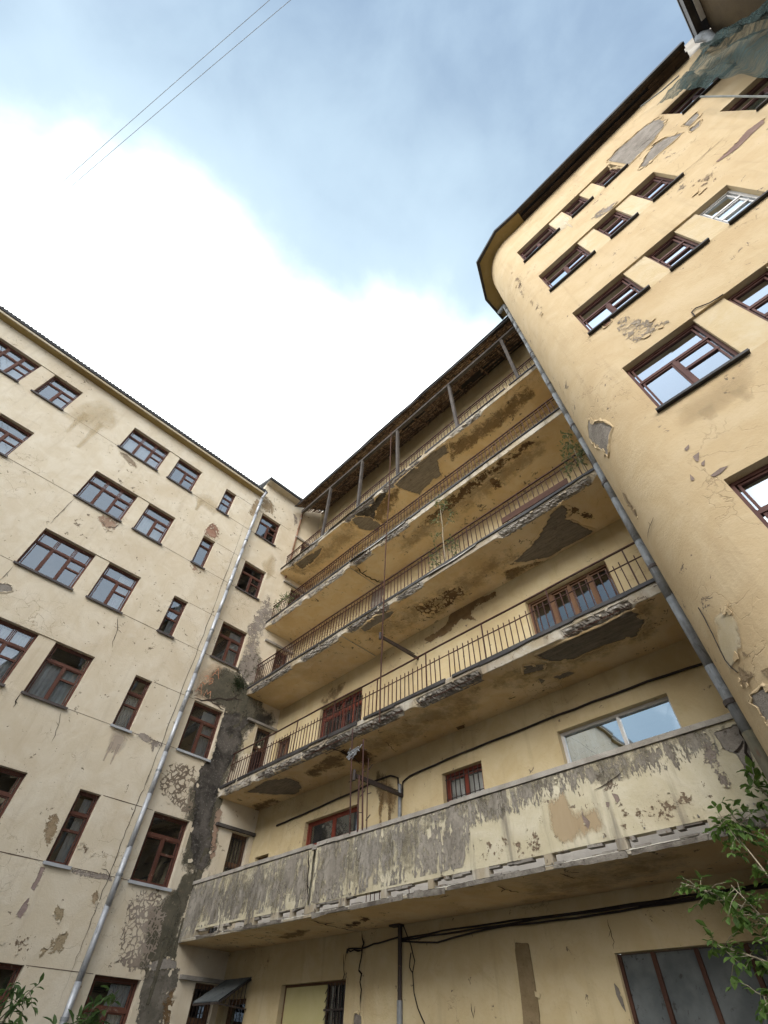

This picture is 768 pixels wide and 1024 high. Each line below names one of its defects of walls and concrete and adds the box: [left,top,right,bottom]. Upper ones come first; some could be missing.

flaking render [606,111,703,171]
peeling [602,316,669,343]
damp [447,390,534,461]
flaking render [587,418,614,458]
flaking render [235,411,496,694]
flaking render [498,476,596,565]
flaking render [520,600,648,684]
peeling [715,602,768,727]
peeling [43,814,59,847]
damp [139,649,304,1005]
flaking render [159,708,766,943]
peeling [114,888,180,1024]